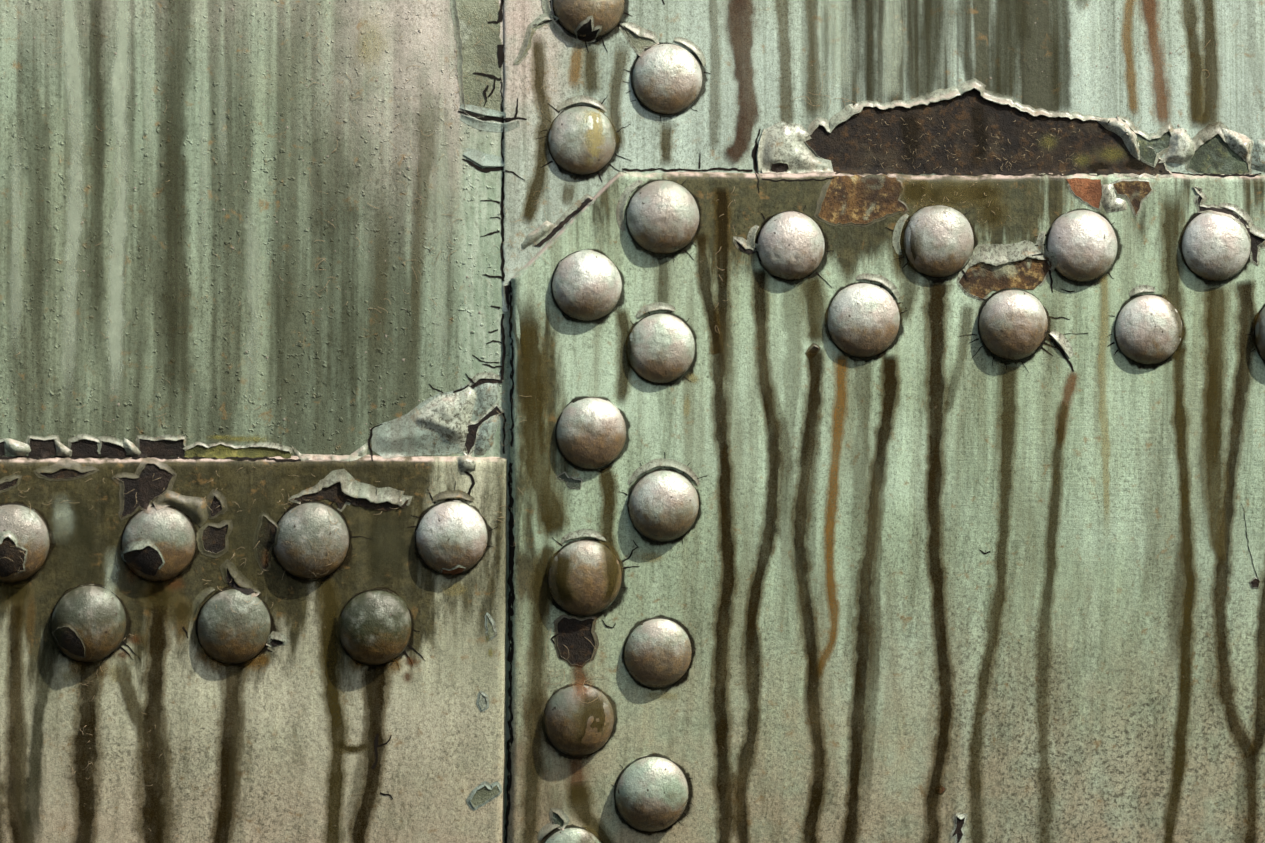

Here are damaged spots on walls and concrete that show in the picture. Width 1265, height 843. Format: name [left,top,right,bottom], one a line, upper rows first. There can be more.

crack [533,1,835,219]
corrosion [726,0,758,162]
peeling [769,160,790,174]
peeling [804,78,1265,266]
peeling [0,434,293,520]
peeling [288,469,413,512]
crack [410,471,475,527]
crack [429,0,560,843]
leakage [697,189,781,843]
leakage [793,277,825,843]
leakage [896,234,956,843]
leakage [1204,281,1265,843]